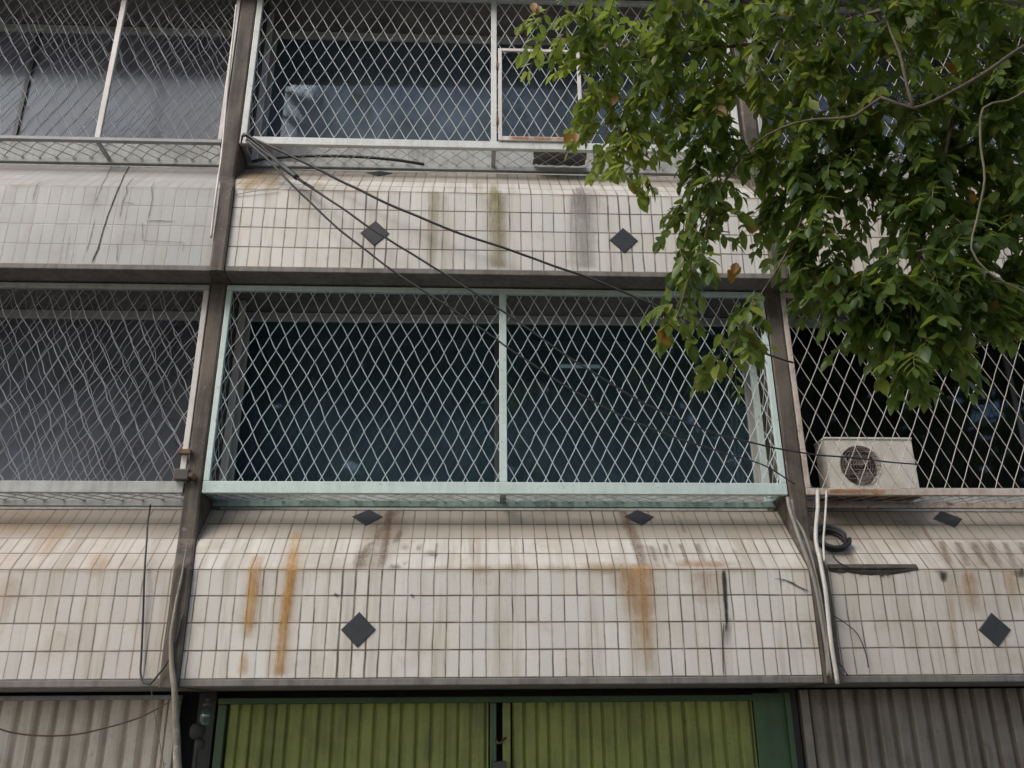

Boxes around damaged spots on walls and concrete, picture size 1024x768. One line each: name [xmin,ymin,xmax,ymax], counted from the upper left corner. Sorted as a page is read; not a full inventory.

crack [87,167,170,261]
corrosion [278,561,294,672]